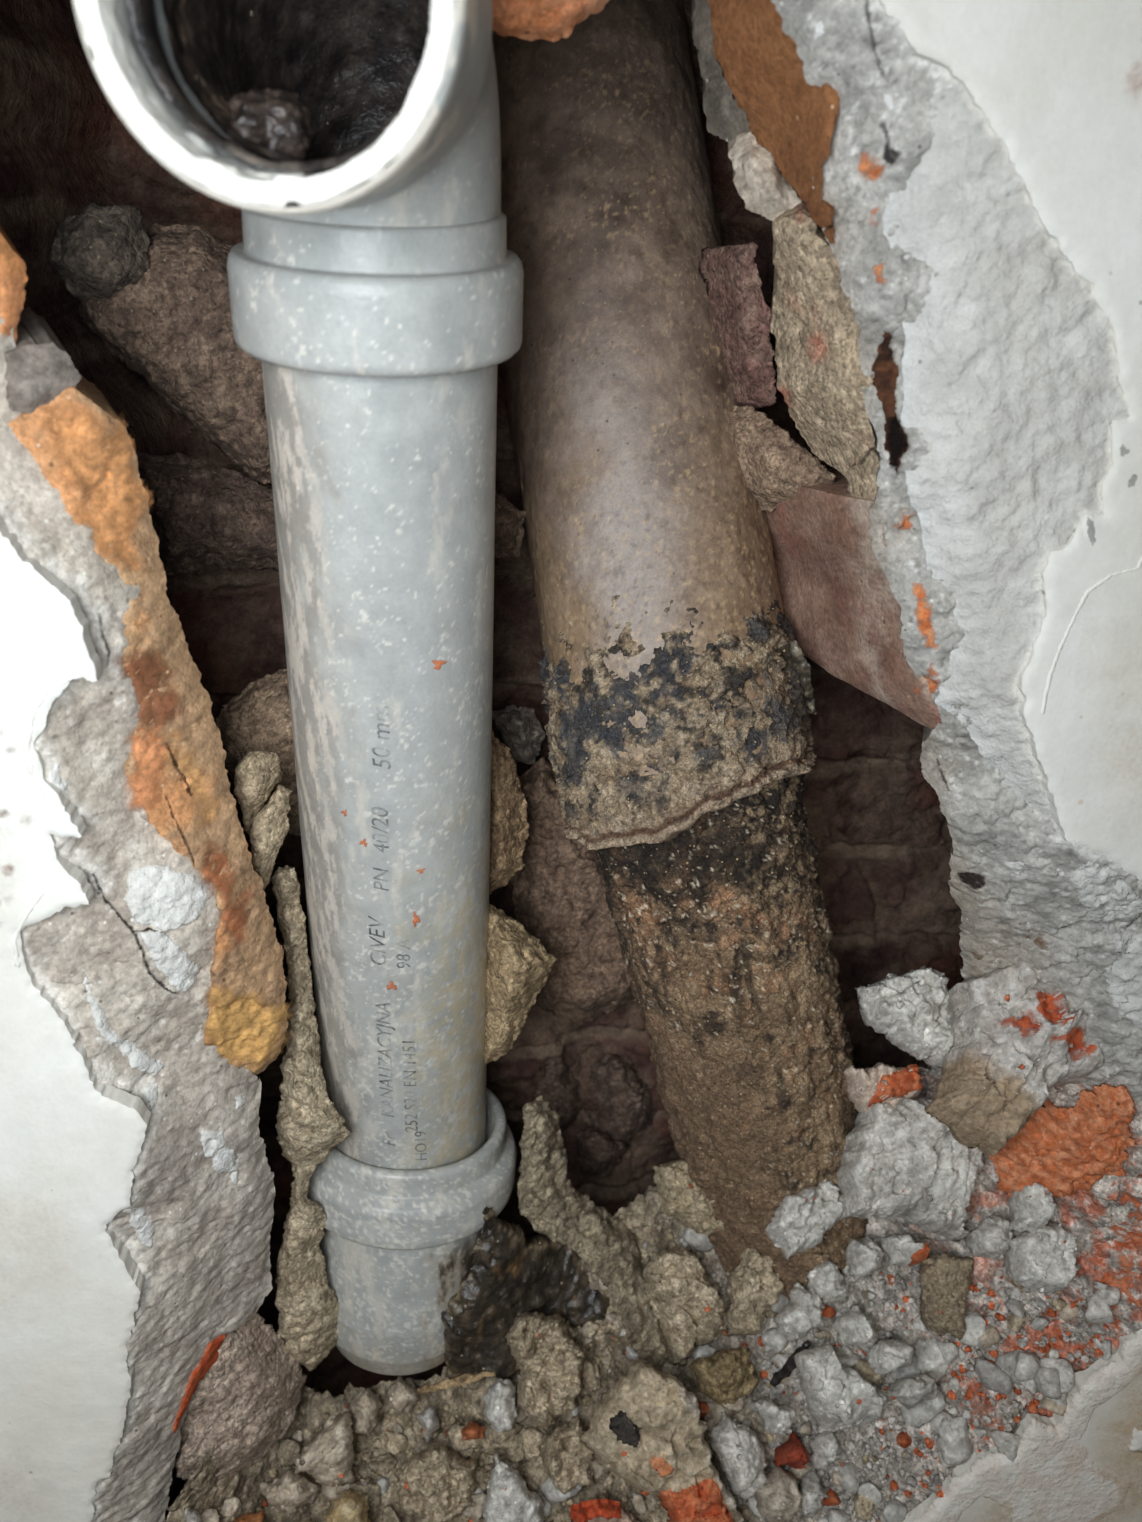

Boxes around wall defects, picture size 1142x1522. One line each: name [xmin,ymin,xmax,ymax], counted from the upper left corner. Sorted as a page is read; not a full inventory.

spalling [492,0,609,42]
spalling [492,363,552,776]
spalling [682,0,1142,1107]
spalling [0,0,316,1522]
spalling [489,881,516,920]
spalling [486,996,680,1238]
spalling [301,1346,447,1396]
peeling [911,1329,1142,1522]